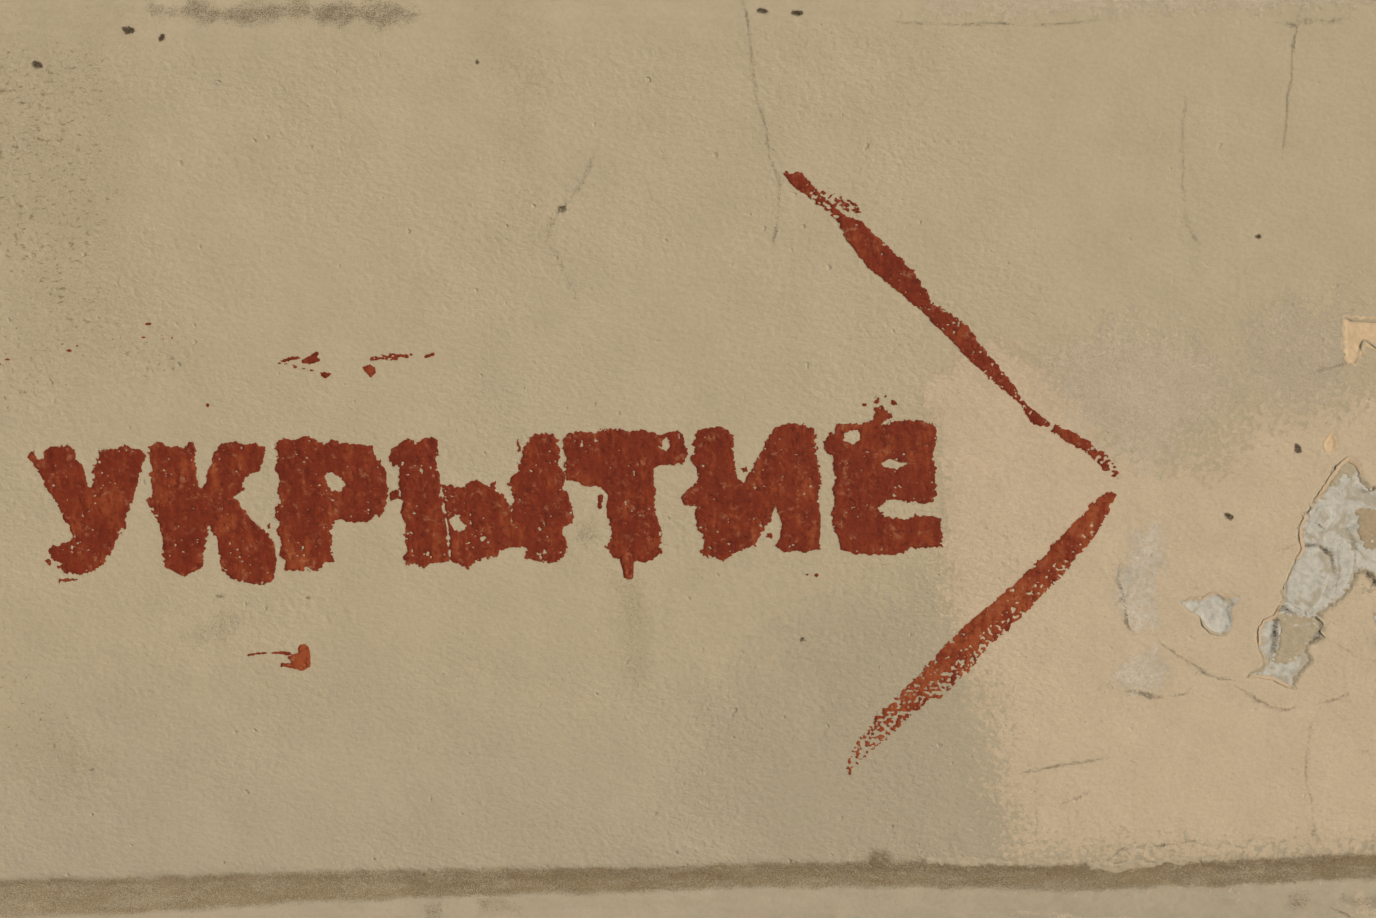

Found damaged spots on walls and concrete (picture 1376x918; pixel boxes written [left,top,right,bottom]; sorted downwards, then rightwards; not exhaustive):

peeling [1340,315,1376,367]
peeling [1249,431,1376,690]
peeling [1180,591,1240,636]